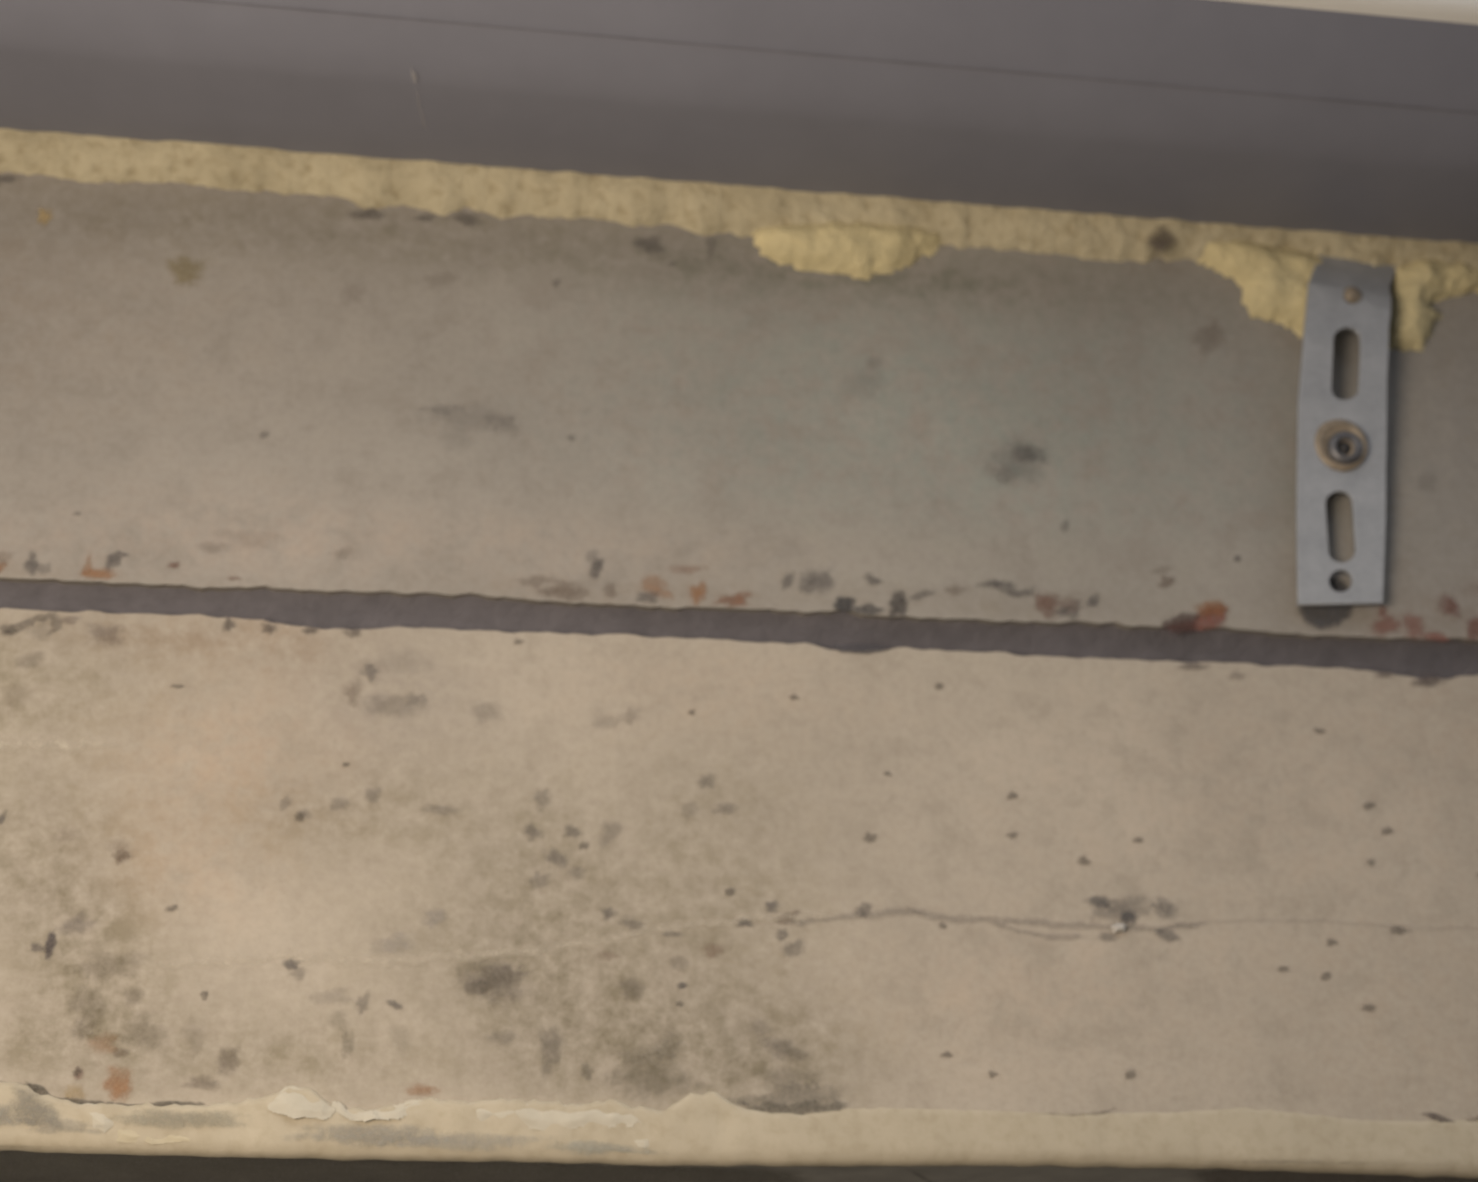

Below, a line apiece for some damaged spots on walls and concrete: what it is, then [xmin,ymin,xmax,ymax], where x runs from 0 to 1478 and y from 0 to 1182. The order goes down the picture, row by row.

rust [1164,605,1227,634]
peeling [0,1082,1478,1178]